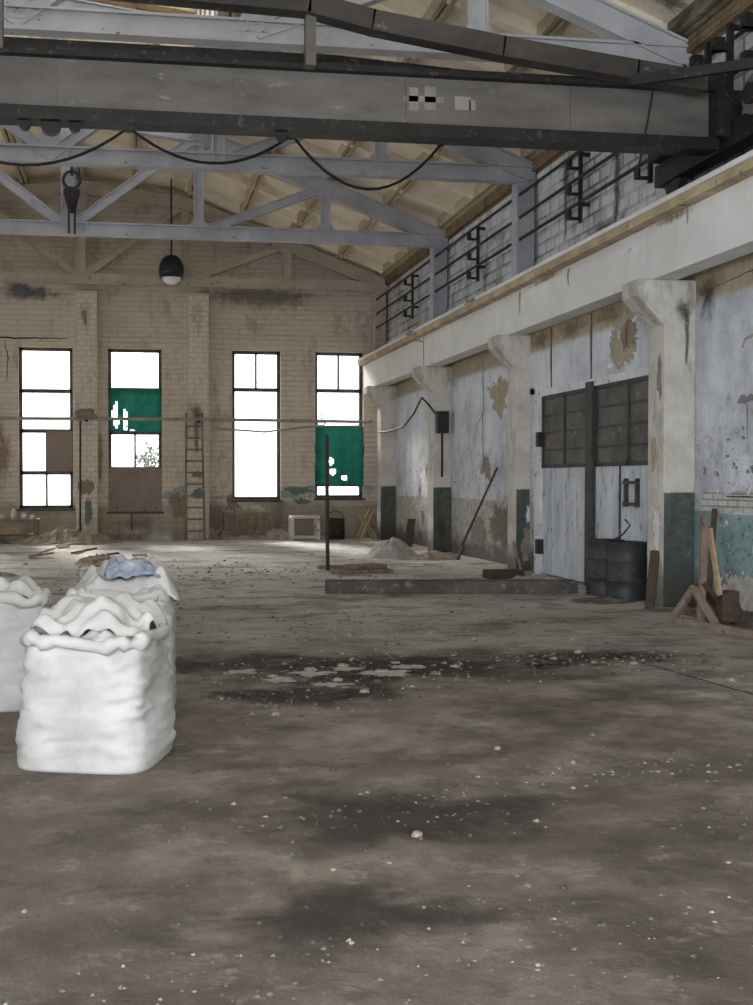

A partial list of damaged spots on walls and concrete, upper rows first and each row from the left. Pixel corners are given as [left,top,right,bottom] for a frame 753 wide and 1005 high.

peeling [607,316,638,368]
flaking render [738,394,753,440]
peeling [652,504,661,551]
flaking render [701,487,753,612]